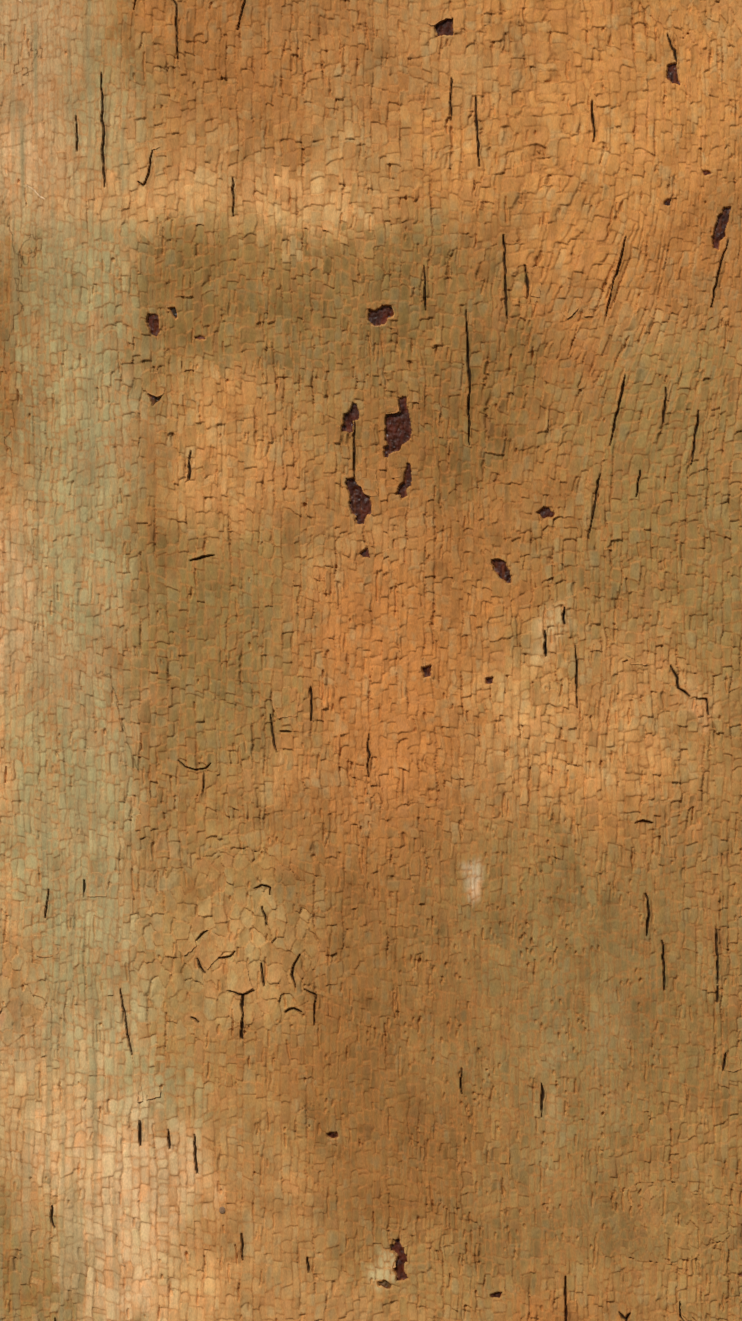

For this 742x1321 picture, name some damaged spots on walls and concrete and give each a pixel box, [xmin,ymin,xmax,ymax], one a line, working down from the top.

peeling [427,13,454,37]
peeling [667,64,680,85]
crack [75,73,106,187]
crack [448,78,481,167]
peeling [713,207,731,250]
peeling [346,397,412,524]
crack [587,375,626,539]
peeling [492,560,511,583]
crack [543,607,578,708]
crack [195,930,317,1040]
crack [137,1120,199,1174]
peeling [379,1232,410,1289]